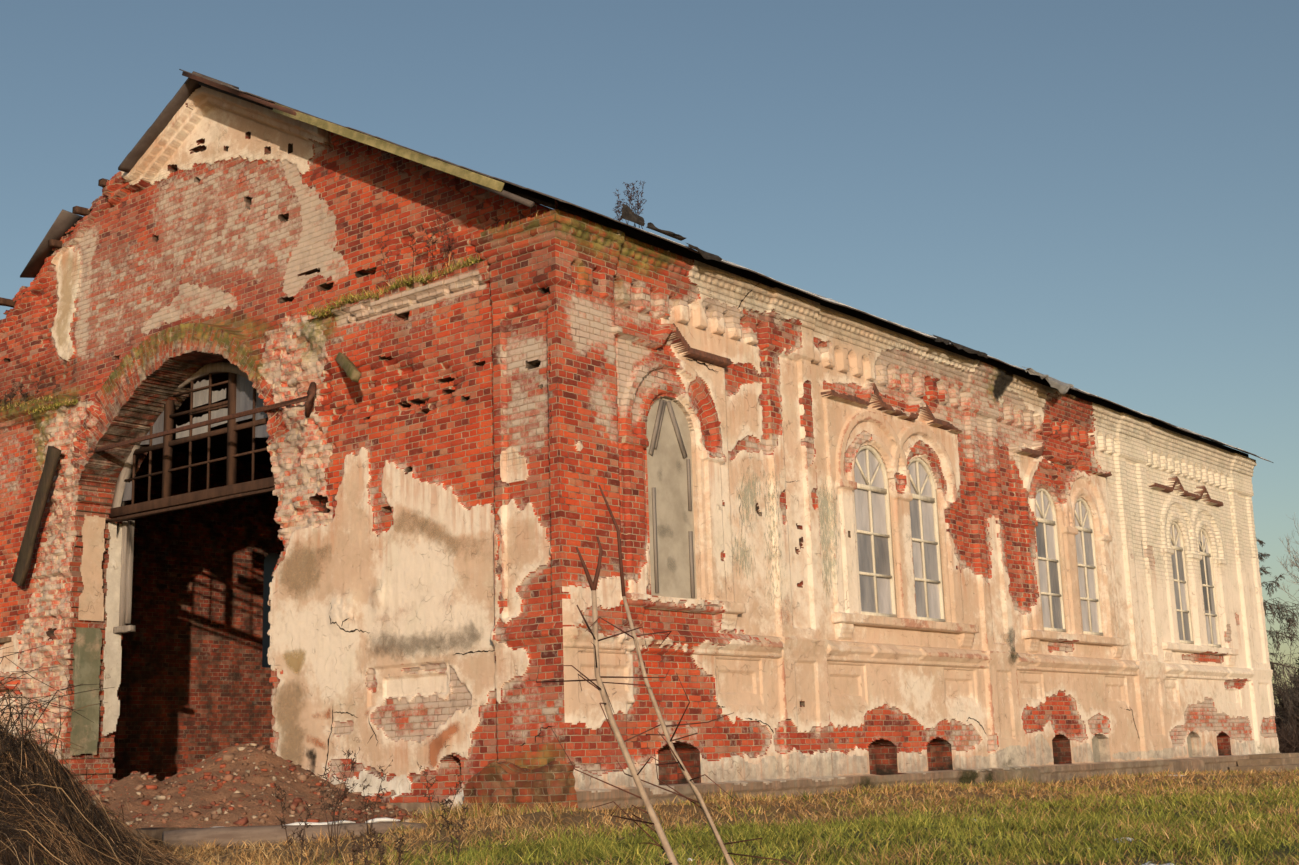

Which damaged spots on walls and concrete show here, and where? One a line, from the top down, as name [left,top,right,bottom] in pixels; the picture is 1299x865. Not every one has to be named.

peeling [4,246,82,389]
peeling [136,88,1111,800]
spalling [0,400,122,765]
spalling [1130,545,1155,570]
leakage [376,633,478,652]
spalling [1182,613,1251,664]
spalling [1224,678,1248,690]
spalling [1113,697,1278,761]